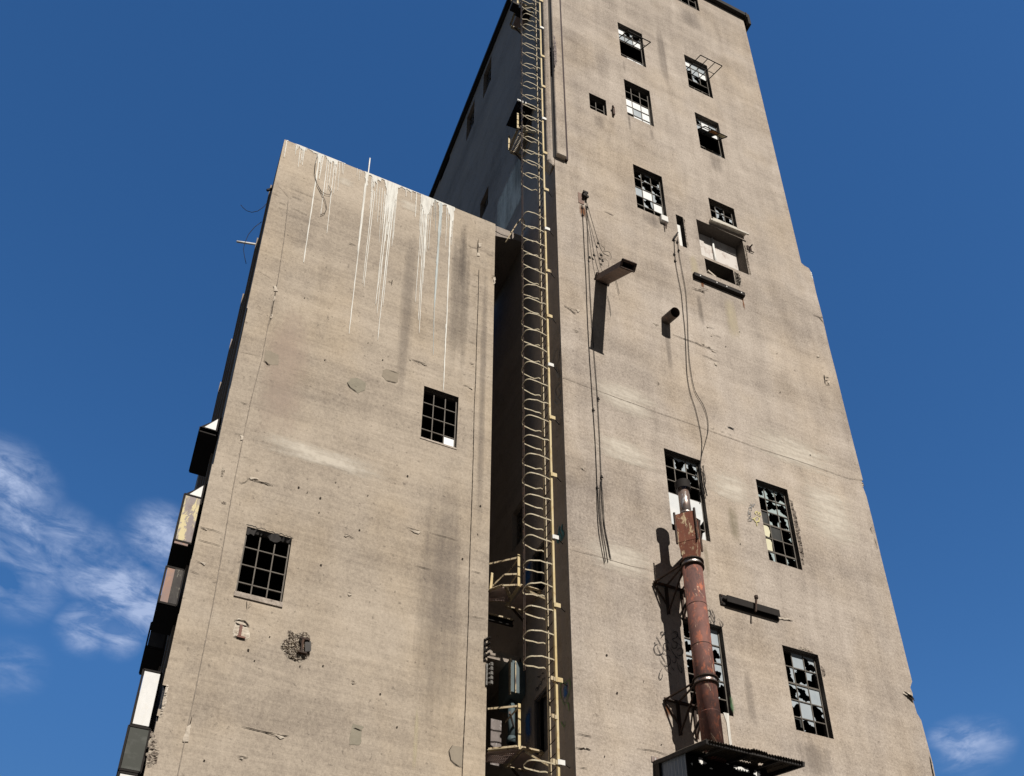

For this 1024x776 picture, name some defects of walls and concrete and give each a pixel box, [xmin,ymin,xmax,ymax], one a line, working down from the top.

water stain [284,140,455,391]
spalling [233,618,250,640]
spalling [280,630,311,663]
spalling [146,731,159,768]